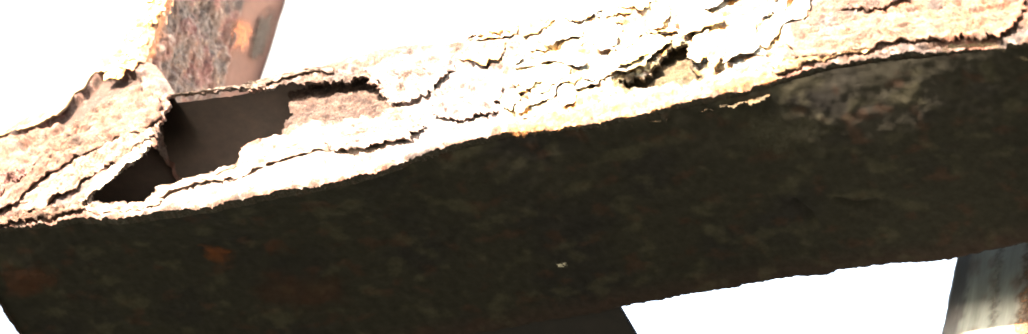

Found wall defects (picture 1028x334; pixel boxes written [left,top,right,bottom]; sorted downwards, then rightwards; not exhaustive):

corrosion [0,0,169,227]
corrosion [232,21,252,50]
peeling [282,0,810,152]
corrosion [508,0,1028,130]
corrosion [1013,245,1028,334]